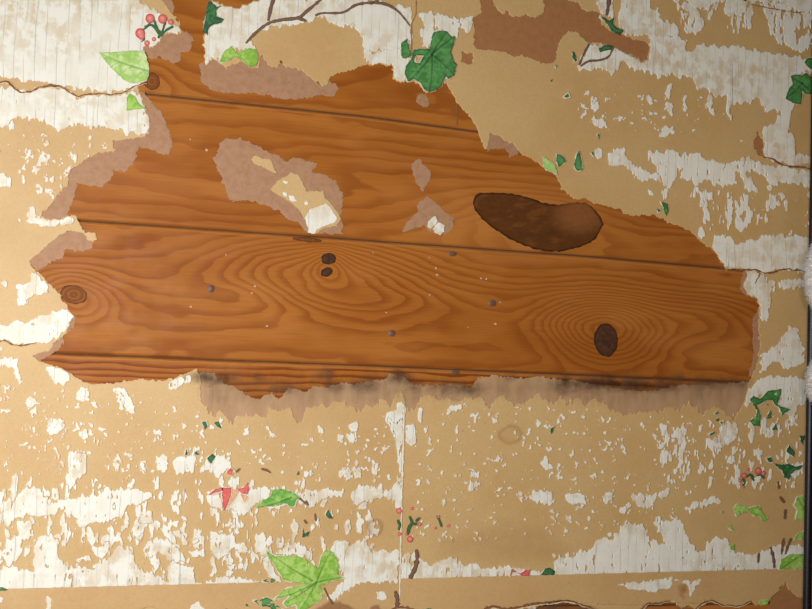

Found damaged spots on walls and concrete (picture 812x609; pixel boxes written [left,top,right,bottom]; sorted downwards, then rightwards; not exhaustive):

crack [0,81,147,98]
peeling [754,131,764,155]
peeling [0,173,12,188]
peeling [30,0,760,443]
peeling [657,423,687,460]
crack [484,600,593,609]
peeling [528,601,591,609]
crack [641,600,751,609]
peeling [645,584,803,609]